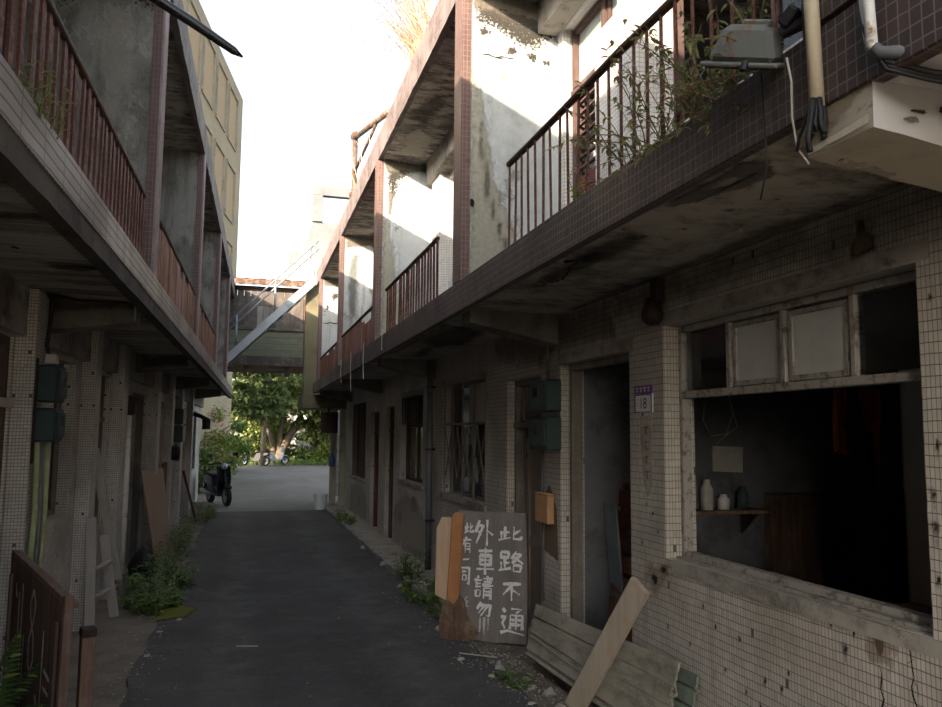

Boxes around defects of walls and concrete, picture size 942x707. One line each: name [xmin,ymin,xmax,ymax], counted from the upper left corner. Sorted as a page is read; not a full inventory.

leakage [469,0,556,273]
leakage [324,160,426,335]
leakage [572,182,912,310]
crack [878,665,886,707]
crack [908,650,919,707]